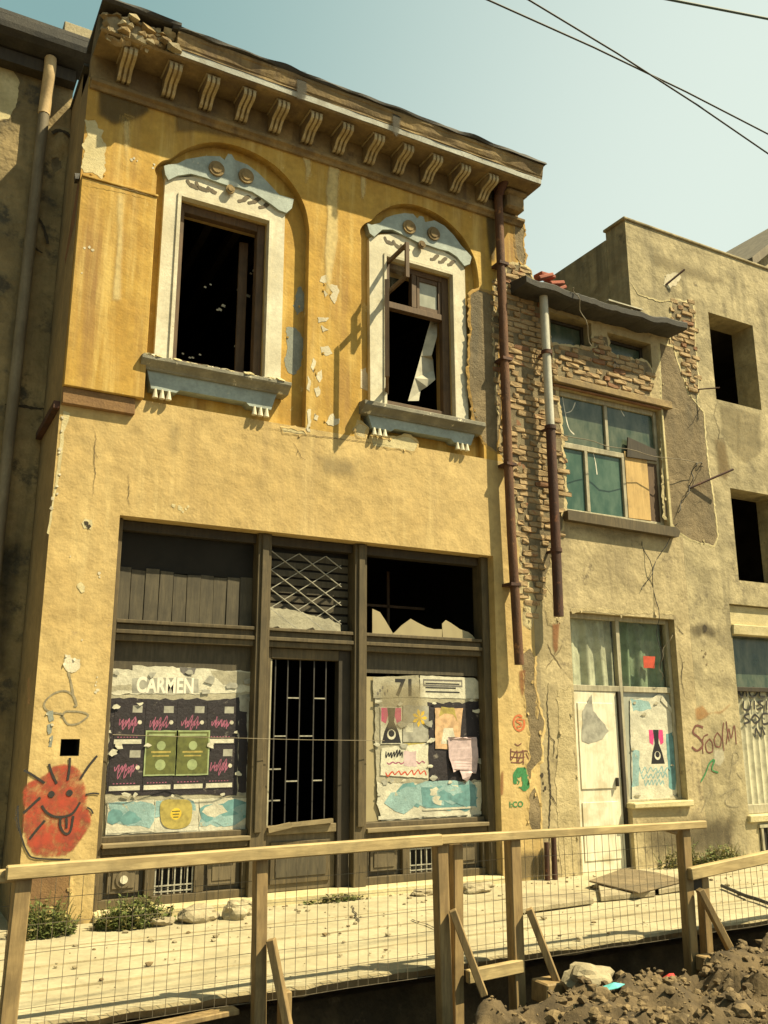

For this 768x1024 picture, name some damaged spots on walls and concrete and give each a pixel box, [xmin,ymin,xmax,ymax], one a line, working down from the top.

spalling [100,12,167,53]
peeling [81,119,106,179]
peeling [293,287,304,315]
peeling [320,275,339,303]
peeling [284,327,333,396]
spalling [279,409,340,437]
spalling [352,420,419,455]
spalling [466,223,719,630]
spalling [47,411,70,534]